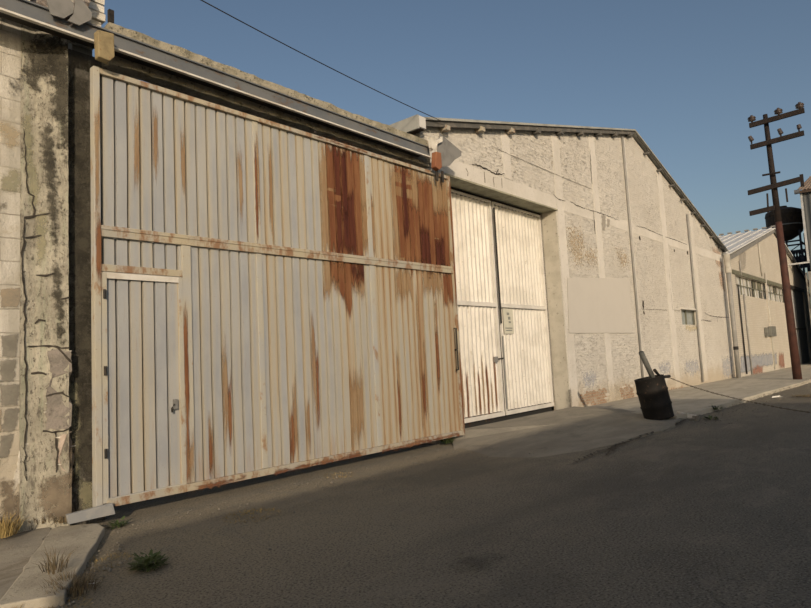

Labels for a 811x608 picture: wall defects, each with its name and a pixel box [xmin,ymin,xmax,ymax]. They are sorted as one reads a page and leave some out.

leakage [0,35,92,523]
crack [21,128,72,481]
corrosion [318,136,375,315]
corrosion [390,164,457,426]
spalling [45,349,76,473]
corrosion [184,310,194,481]
corrosion [222,357,232,444]
corrosion [382,358,498,452]